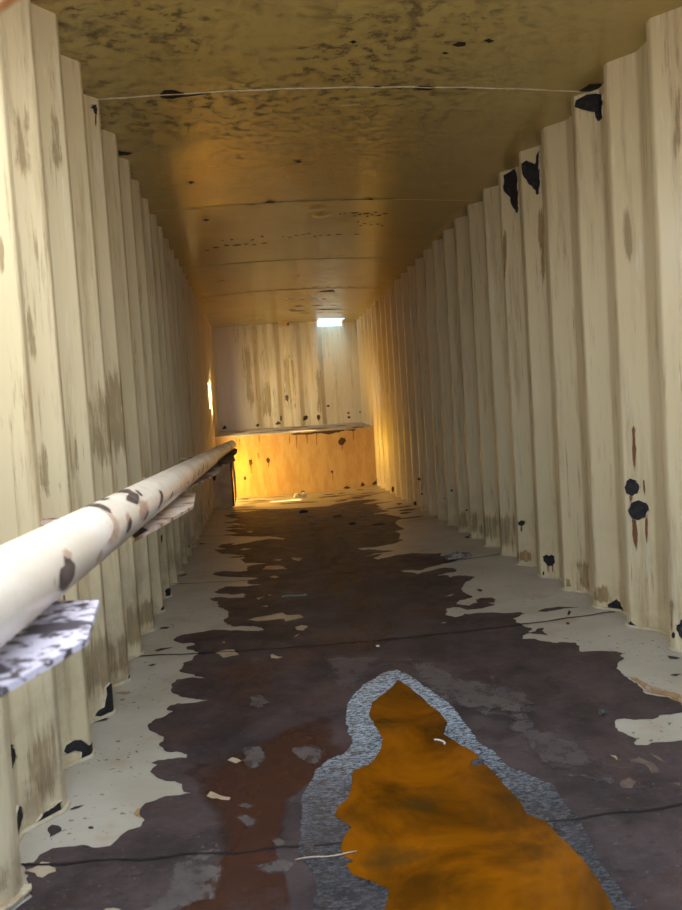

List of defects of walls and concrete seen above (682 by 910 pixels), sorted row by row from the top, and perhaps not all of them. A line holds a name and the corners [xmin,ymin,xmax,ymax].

peeling [574,93,603,121]
peeling [503,151,541,213]
peeling [126,464,207,538]
rust [624,478,645,502]
peeling [0,489,682,910]